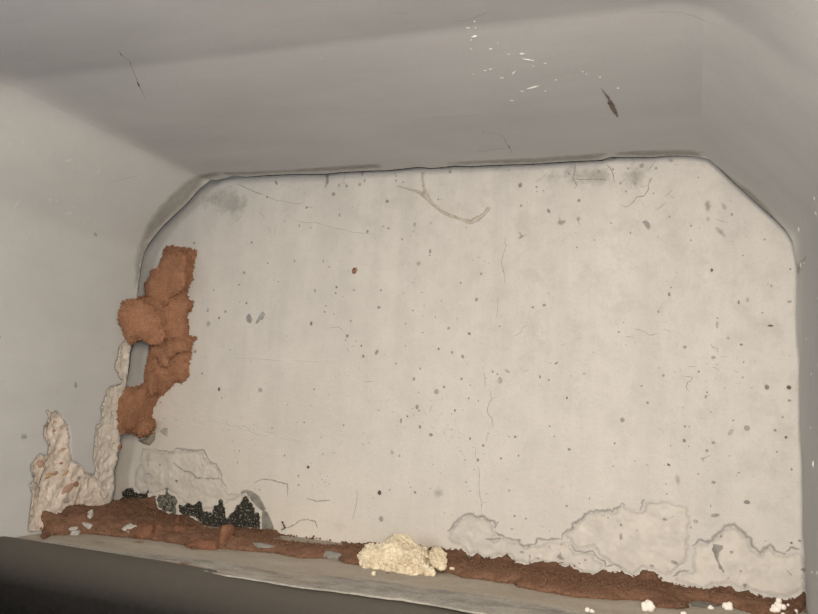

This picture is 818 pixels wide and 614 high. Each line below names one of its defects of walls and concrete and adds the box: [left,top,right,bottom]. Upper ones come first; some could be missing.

crack [138,156,675,288]
crack [694,156,790,237]
crack [95,341,138,469]
peeling [135,448,240,509]
damp [122,488,286,530]
peeling [448,499,803,595]